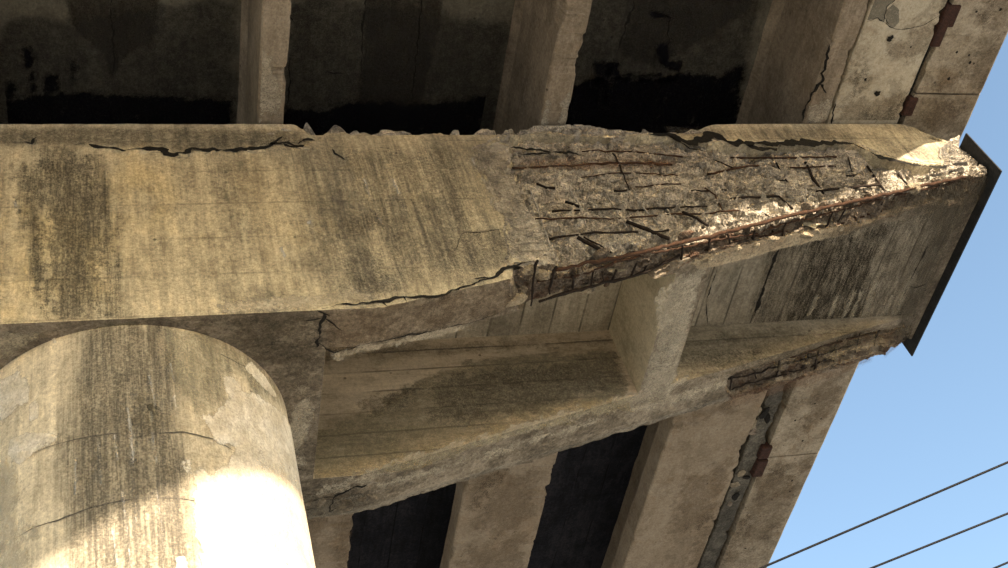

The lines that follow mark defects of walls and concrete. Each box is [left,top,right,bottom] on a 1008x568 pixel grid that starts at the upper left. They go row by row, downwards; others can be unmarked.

crack [74,136,346,160]
water stain [284,0,508,130]
water stain [573,0,760,111]
crack [649,45,968,169]
peeling [867,0,899,42]
water stain [0,0,301,568]
crack [306,229,534,353]
spalling [471,94,987,402]
crack [16,497,195,538]
peeling [175,556,188,568]
peeling [182,362,379,568]
water stain [314,351,727,496]